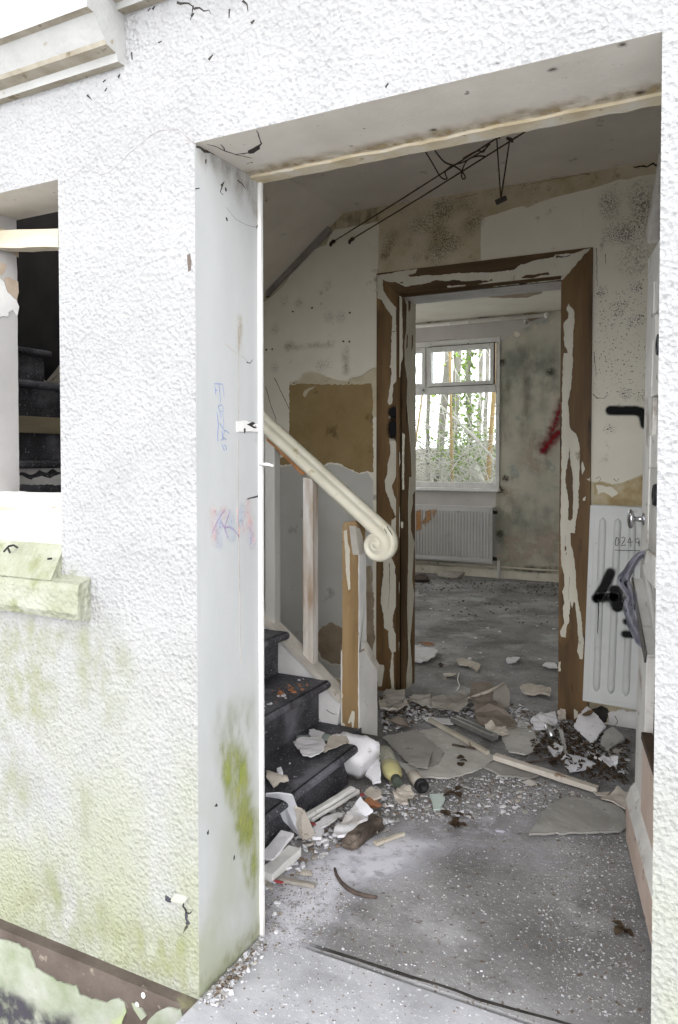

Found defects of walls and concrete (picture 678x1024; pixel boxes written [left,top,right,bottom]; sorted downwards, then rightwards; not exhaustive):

peeling [0,215,16,230]
peeling [0,250,61,492]
peeling [289,248,590,689]
peeling [560,304,643,659]
water stain [224,751,256,875]
crack [165,893,192,933]
peeling [0,939,183,1024]